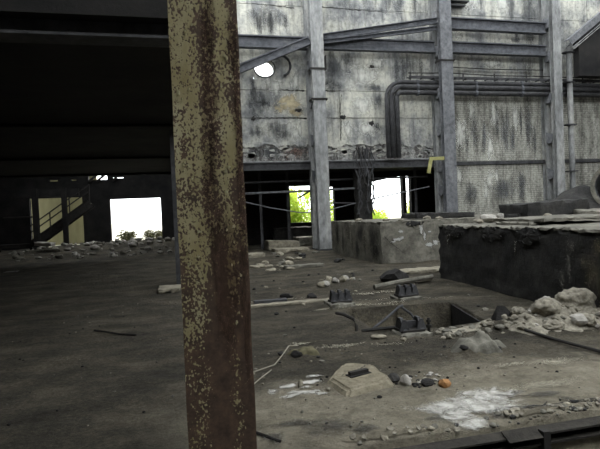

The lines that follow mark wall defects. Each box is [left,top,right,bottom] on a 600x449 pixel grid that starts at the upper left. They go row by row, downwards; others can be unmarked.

water stain [254,10,287,34]
water stain [348,60,381,89]
peeling [243,142,307,159]
peeling [328,140,386,157]
water stain [457,103,475,149]
water stain [483,125,493,157]
water stain [491,104,536,153]
corrosion [202,0,250,359]
water stain [485,173,510,198]